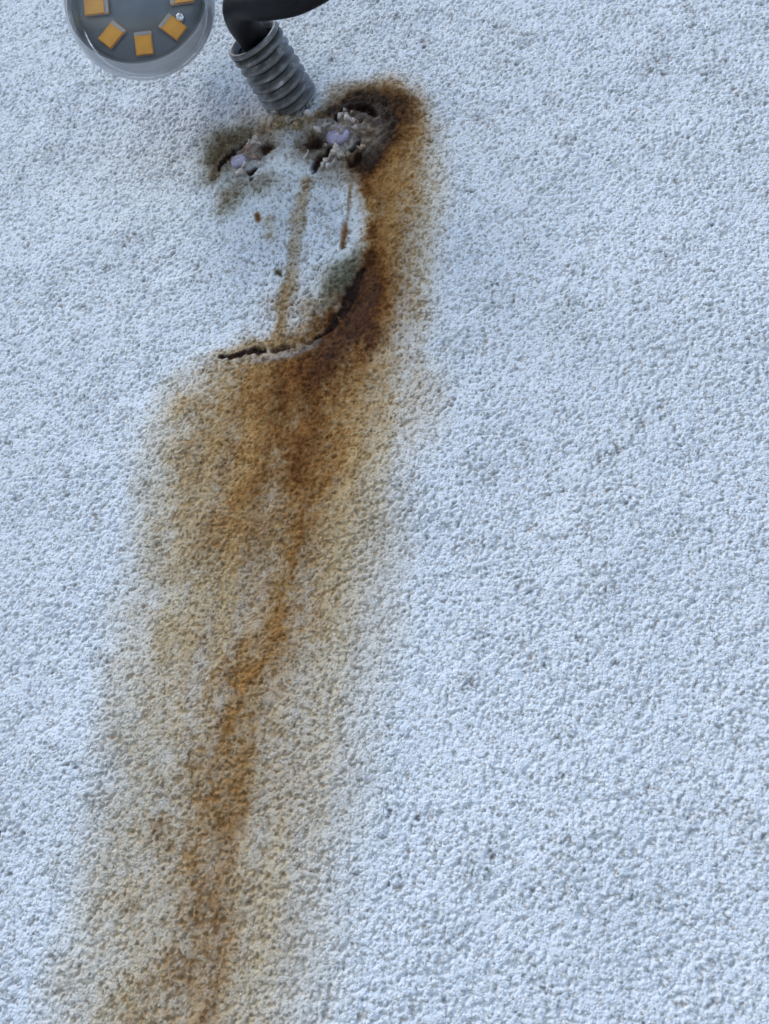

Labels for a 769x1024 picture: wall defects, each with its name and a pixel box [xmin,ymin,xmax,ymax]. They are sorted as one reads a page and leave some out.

spalling [219,107,377,181]
crack [219,269,365,360]
corrosion [154,85,426,985]
corrosion [111,948,207,1024]